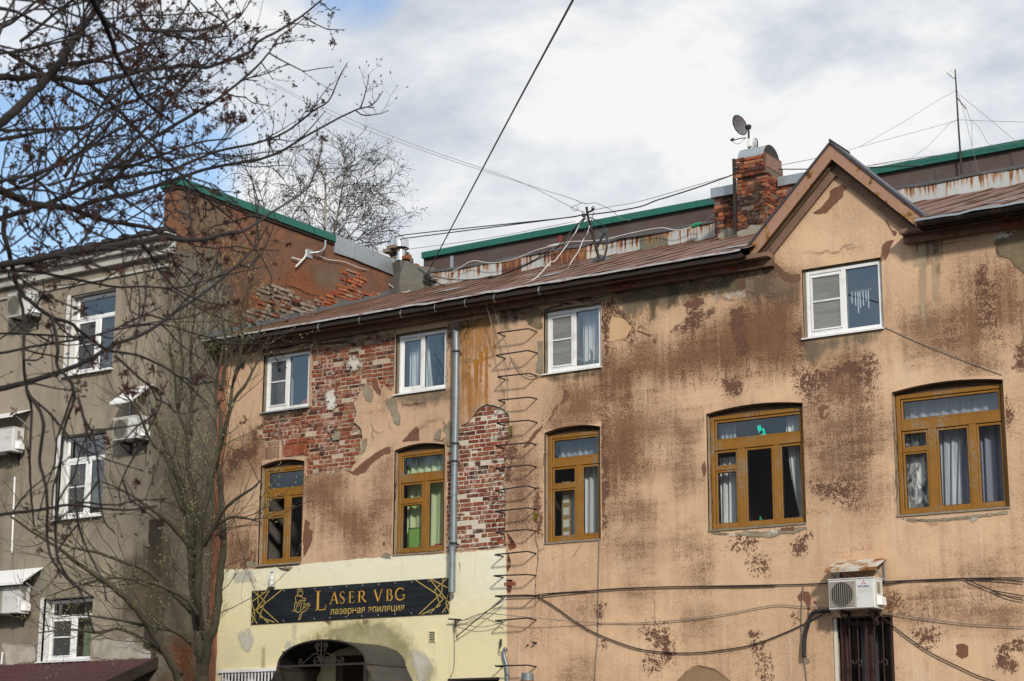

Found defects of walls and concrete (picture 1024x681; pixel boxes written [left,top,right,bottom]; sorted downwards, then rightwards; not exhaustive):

flaking render [229,268,380,333]
damp [616,274,737,318]
corrosion [459,313,495,419]
flaking render [224,333,396,556]
peeling [444,263,881,594]